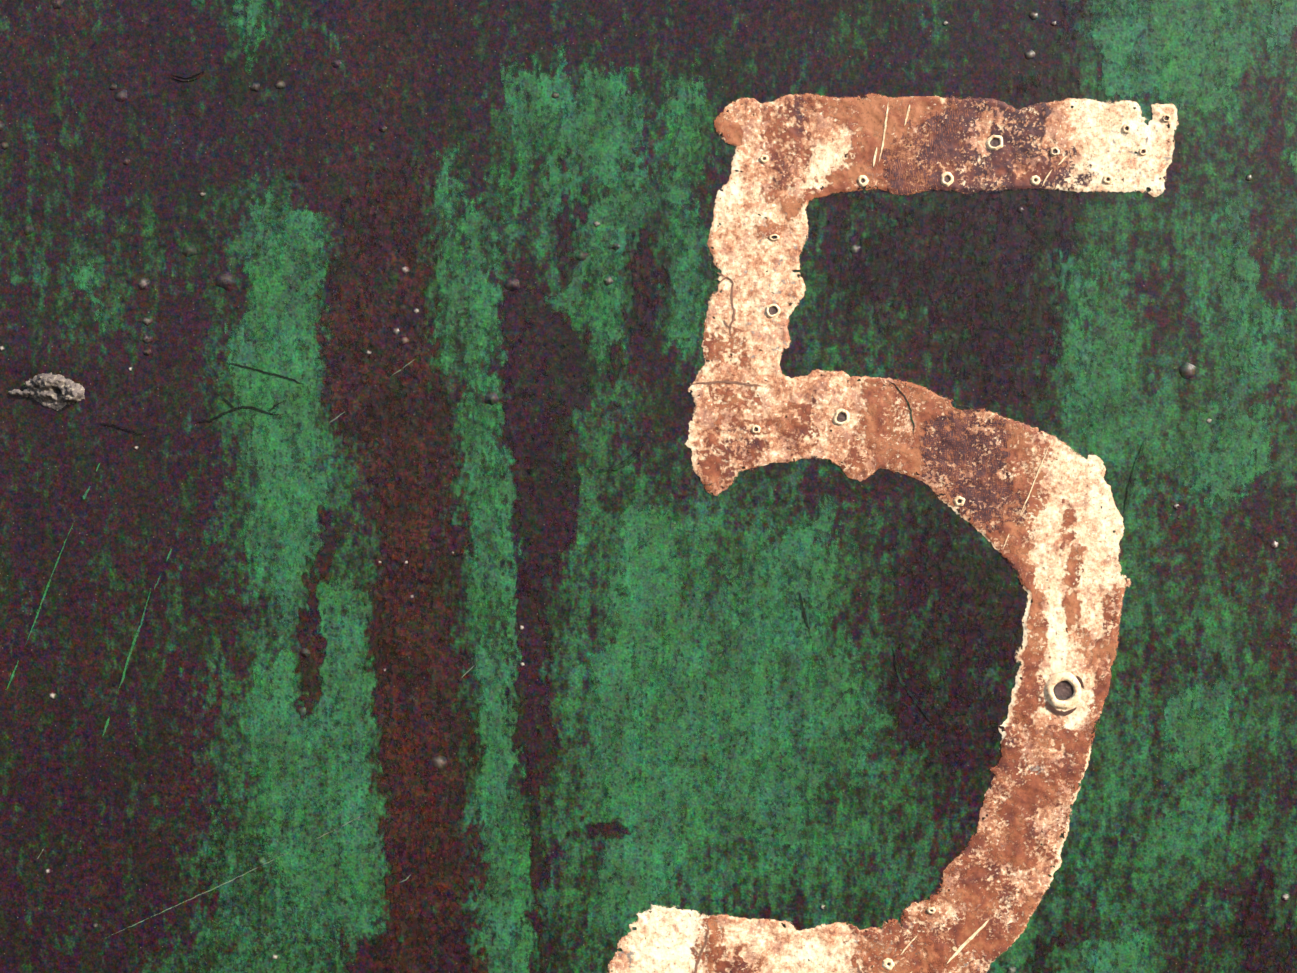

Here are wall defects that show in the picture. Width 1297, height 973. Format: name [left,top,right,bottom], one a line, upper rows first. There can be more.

peeling [229,0,277,73]
rust [714,112,744,146]
rust [754,93,1094,244]
peeling [66,258,106,332]
spalling [8,372,85,411]
rust [696,318,820,491]
rust [840,377,1129,973]
rust [691,915,762,973]